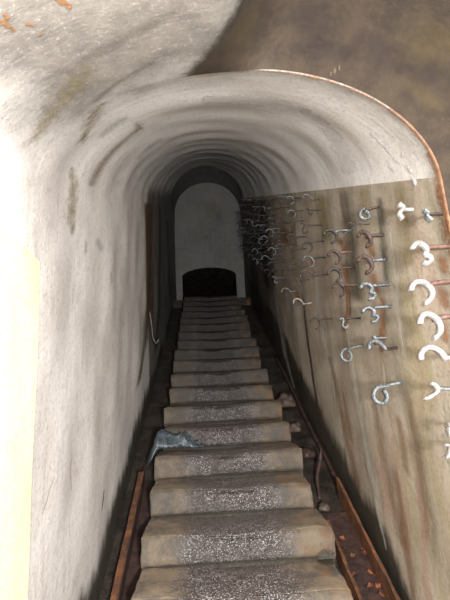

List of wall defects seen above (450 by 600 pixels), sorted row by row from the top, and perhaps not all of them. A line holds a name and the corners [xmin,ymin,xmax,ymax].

corrosion [380,103,450,273]
corrosion [373,275,385,351]